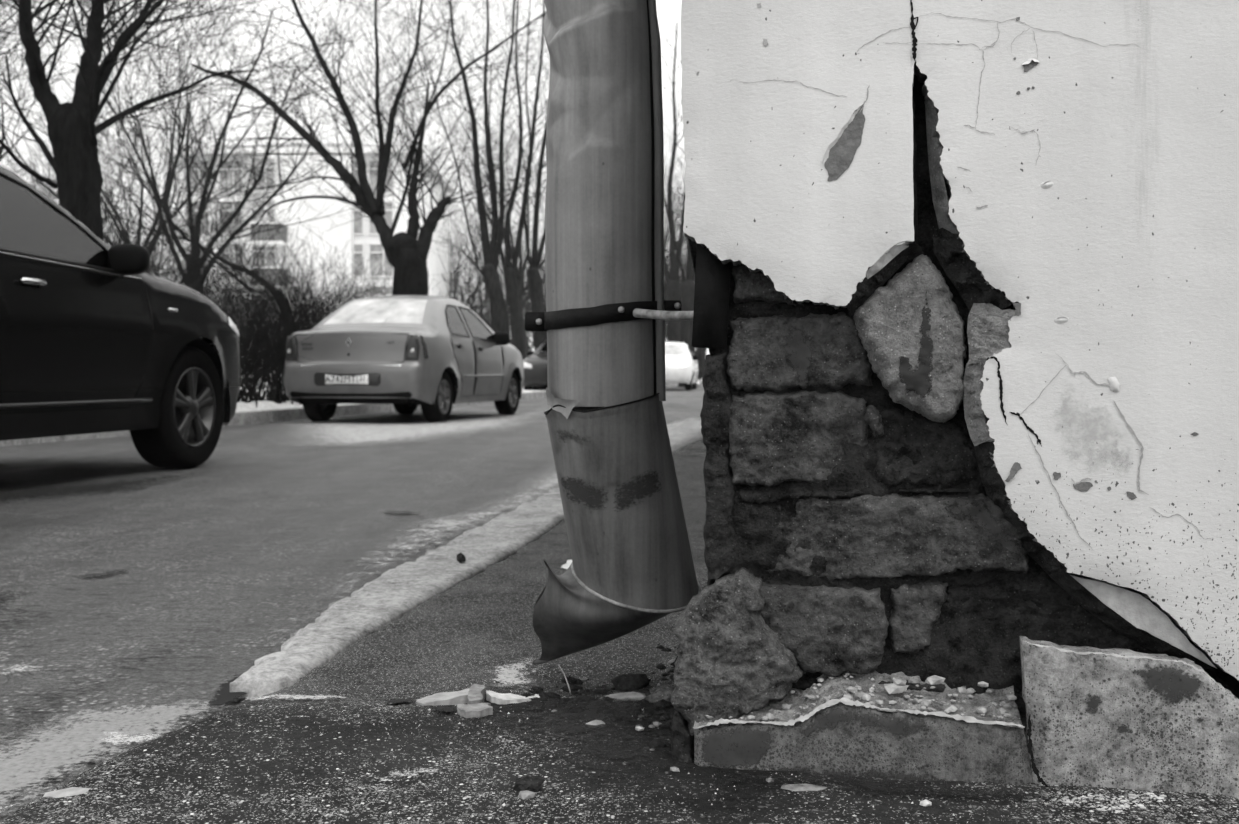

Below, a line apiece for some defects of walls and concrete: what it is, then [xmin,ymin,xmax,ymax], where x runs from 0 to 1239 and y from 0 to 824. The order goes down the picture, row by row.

crack [731,79,870,112]
crack [856,0,1146,161]
peeling [1013,57,1039,72]
spalling [671,76,1239,763]
crack [986,354,1093,550]
crack [1152,508,1211,539]